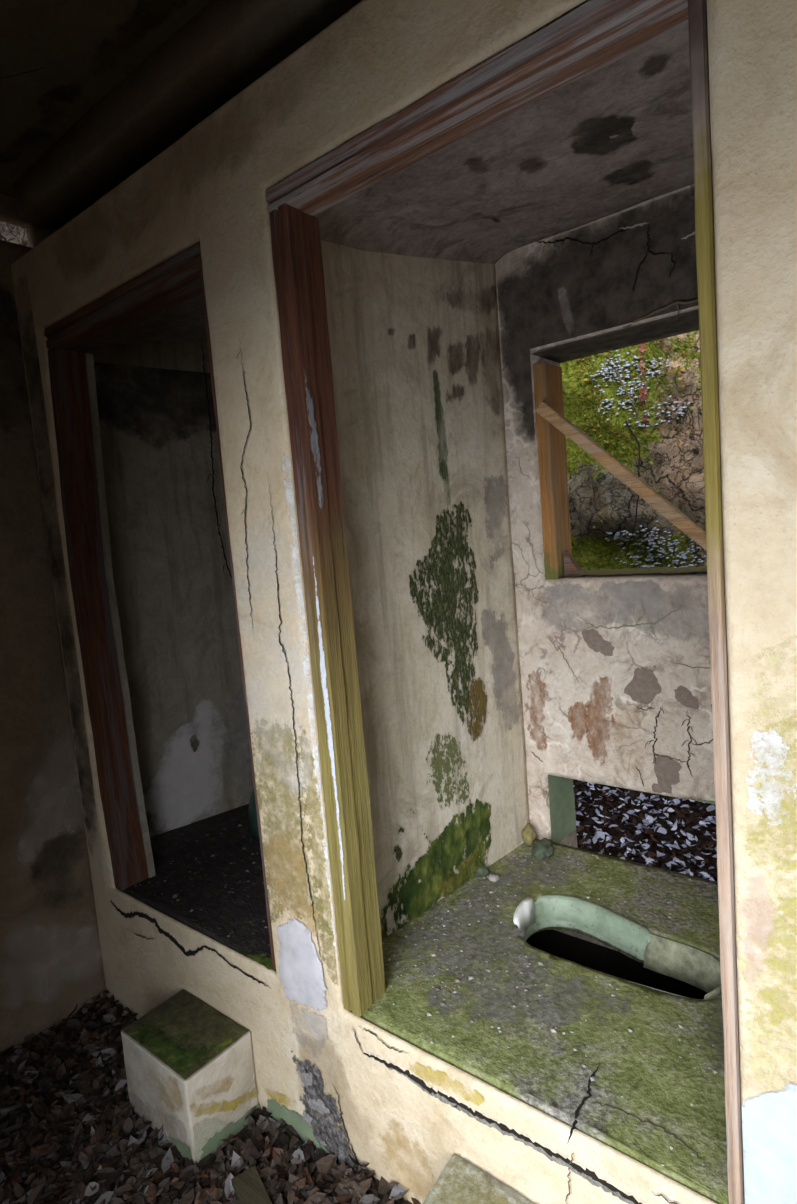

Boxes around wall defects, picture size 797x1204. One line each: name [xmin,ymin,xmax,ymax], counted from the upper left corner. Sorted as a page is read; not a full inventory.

leakage [572,116,636,155]
leakage [94,362,216,447]
crack [201,342,329,996]
leakage [481,610,520,729]
spalling [624,667,699,709]
spalling [652,755,682,794]
crack [636,704,713,786]
leakage [298,726,338,985]
crack [110,899,271,989]
spalling [169,1051,359,1171]
crack [352,1026,709,1204]
flaking render [742,1084,797,1204]